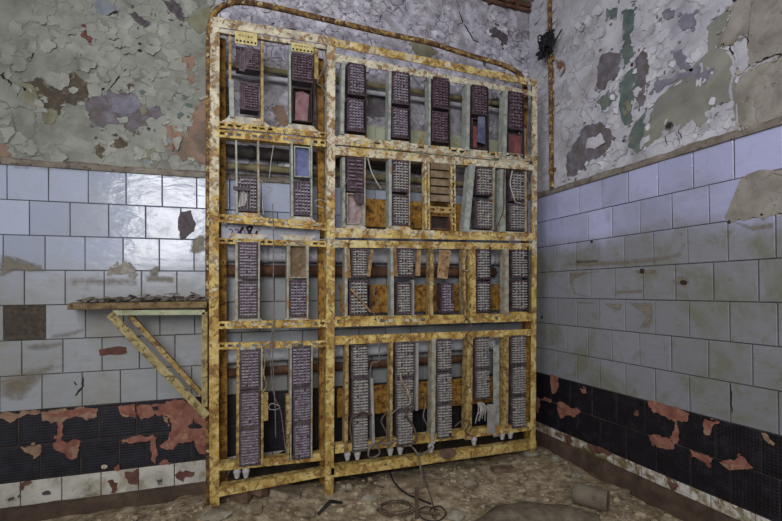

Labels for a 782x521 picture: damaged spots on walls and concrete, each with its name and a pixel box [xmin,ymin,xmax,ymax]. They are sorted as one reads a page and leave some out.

peeling [0,0,394,170]
peeling [406,0,782,191]
spalling [178,210,196,240]
peeling [5,305,46,341]
spalling [99,346,127,356]
spalling [536,374,580,418]
spalling [0,406,98,460]
spalling [118,398,205,466]
spalling [648,400,689,450]
spalling [107,464,139,494]
spalling [175,469,194,482]
spalling [690,449,754,471]